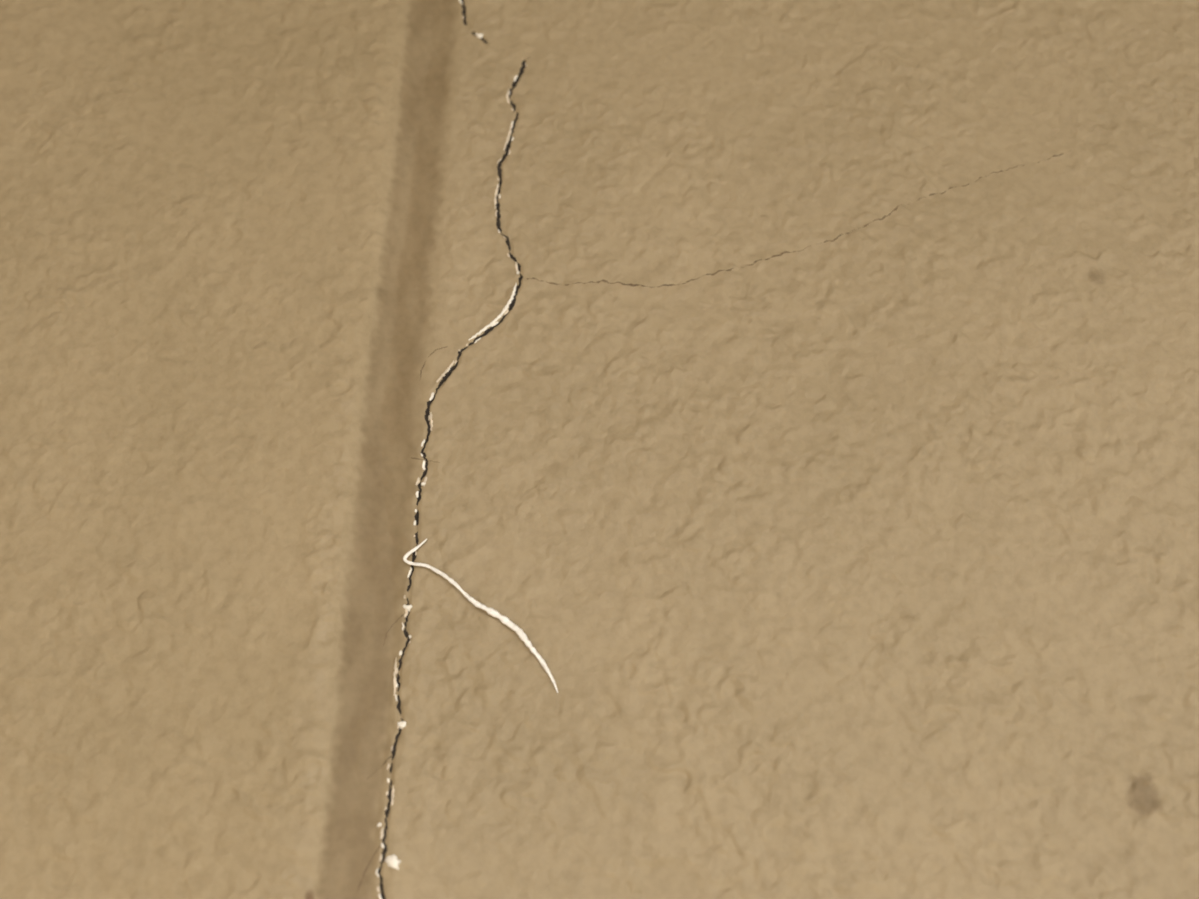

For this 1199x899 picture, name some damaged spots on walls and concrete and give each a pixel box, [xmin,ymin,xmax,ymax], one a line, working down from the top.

crack [459,0,487,44]
crack [356,57,1070,899]